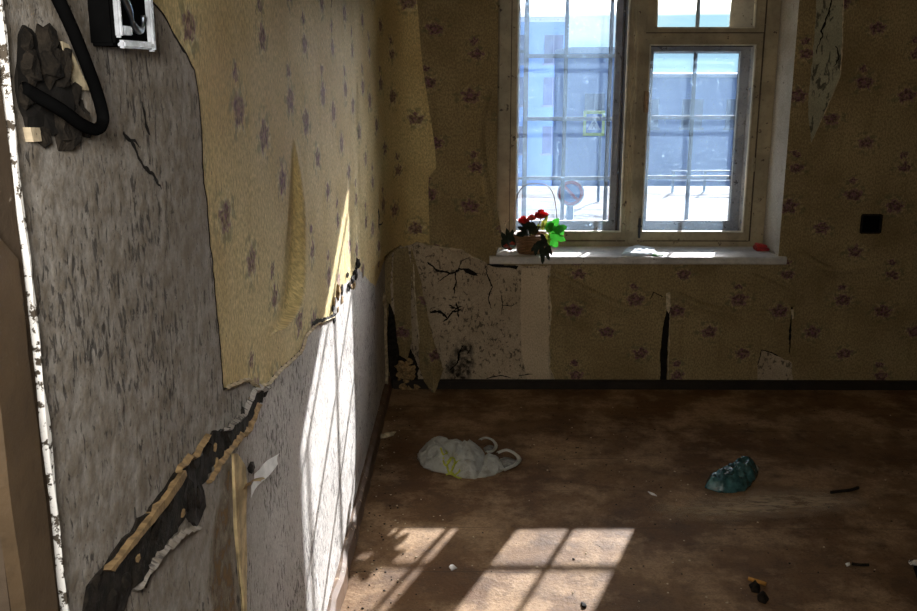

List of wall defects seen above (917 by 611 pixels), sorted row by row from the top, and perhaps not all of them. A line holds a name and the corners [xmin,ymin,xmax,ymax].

peeling [808,0,844,142]
peeling [3,0,555,611]
crack [427,257,515,322]